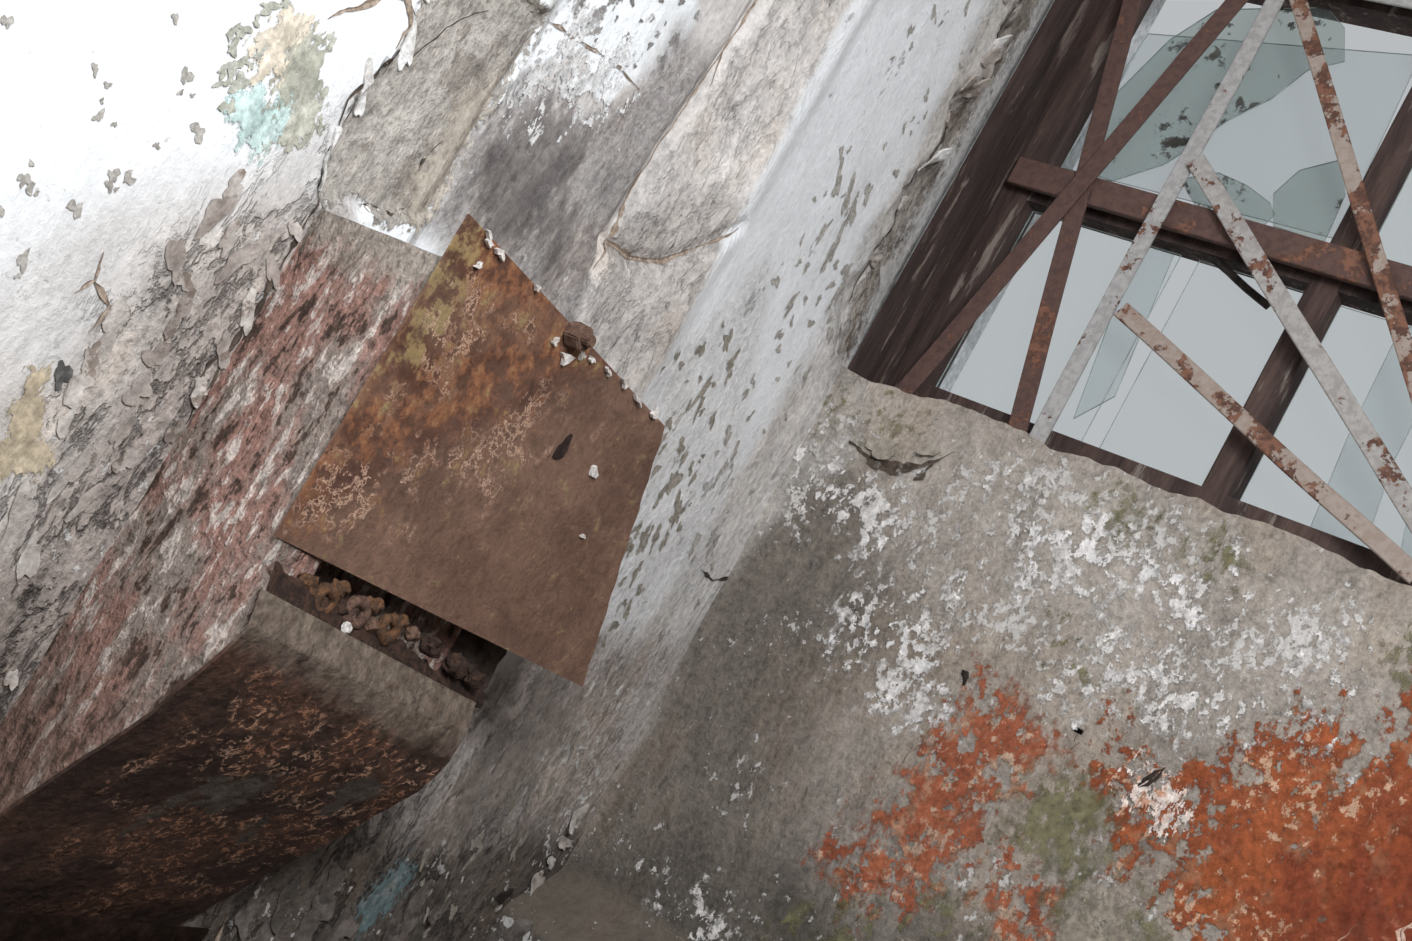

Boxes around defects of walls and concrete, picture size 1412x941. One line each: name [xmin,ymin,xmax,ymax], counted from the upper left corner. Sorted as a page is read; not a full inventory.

damp [474,91,593,269]
spalling [0,0,643,581]
peeling [3,669,19,691]